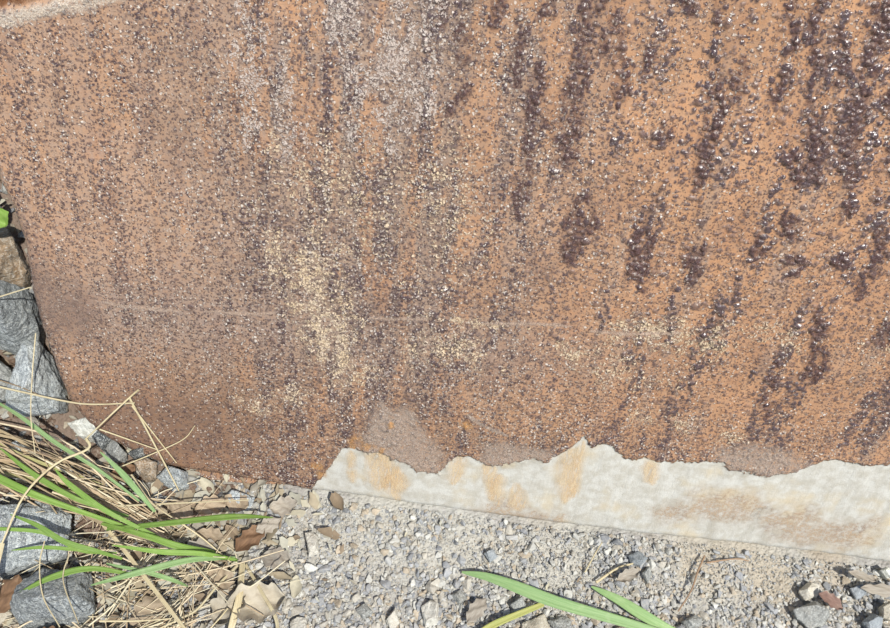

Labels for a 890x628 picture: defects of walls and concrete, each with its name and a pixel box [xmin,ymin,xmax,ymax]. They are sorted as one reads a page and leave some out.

spalling [311,436,890,561]